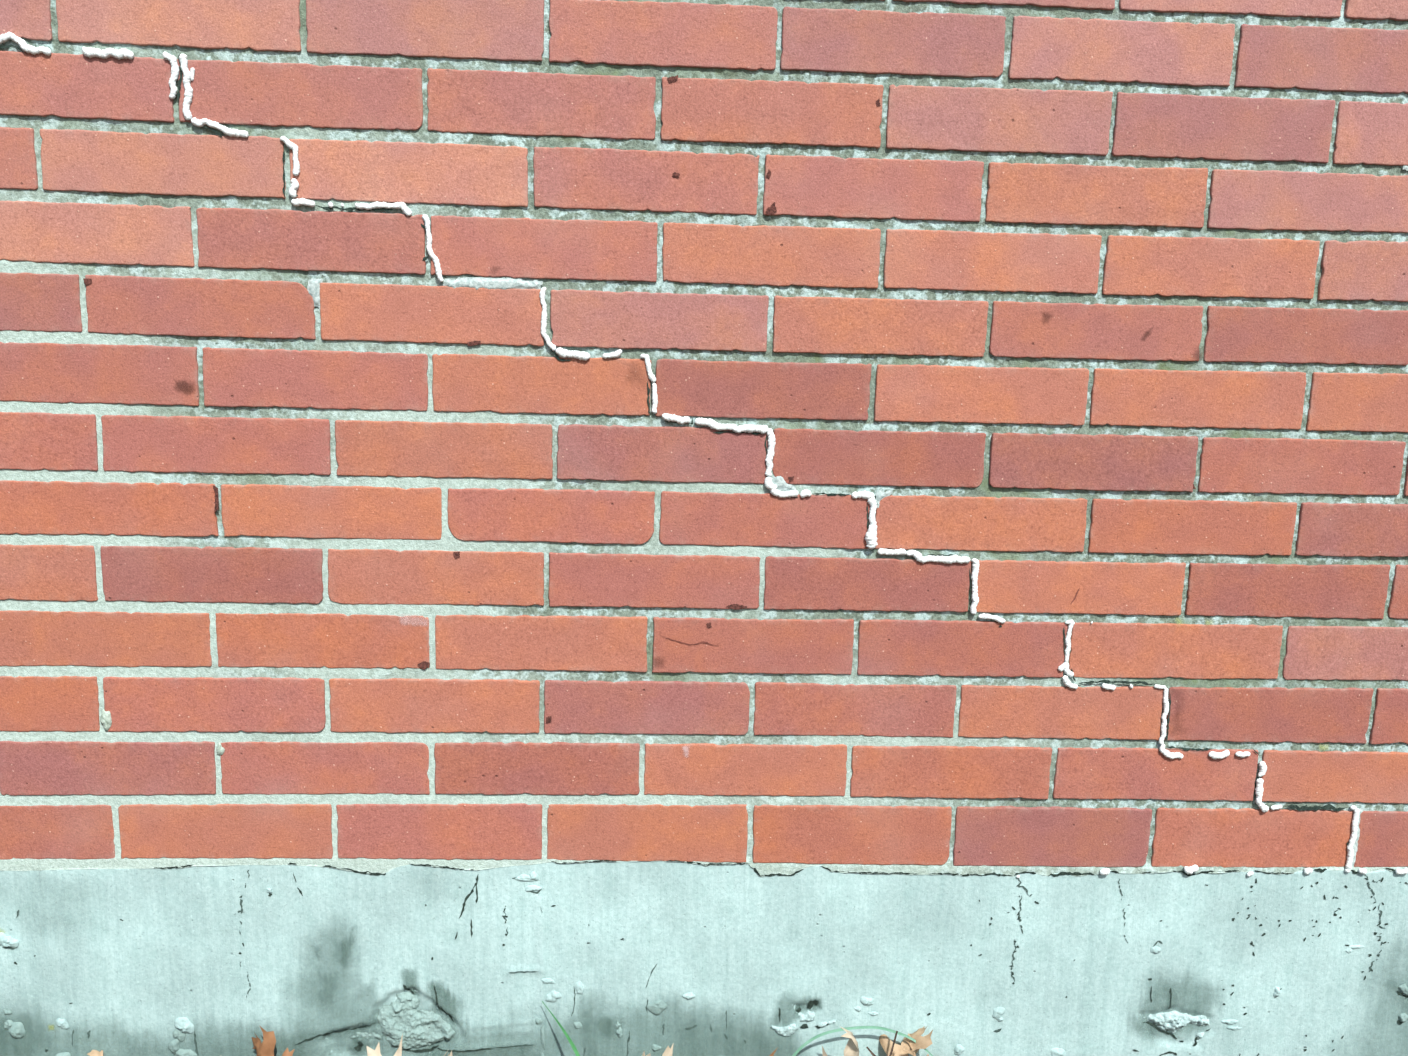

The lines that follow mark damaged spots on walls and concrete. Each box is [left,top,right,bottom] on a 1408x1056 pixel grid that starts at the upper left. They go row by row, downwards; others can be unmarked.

crack [0,32,1006,627]
crack [660,635,718,646]
crack [669,588,1395,982]
crack [234,870,251,997]
crack [289,863,508,939]
water stain [405,975,456,1024]